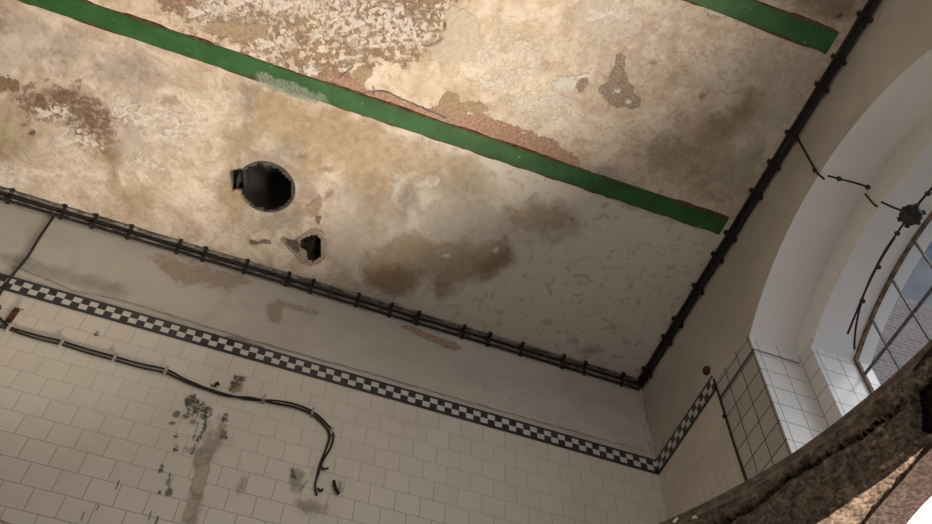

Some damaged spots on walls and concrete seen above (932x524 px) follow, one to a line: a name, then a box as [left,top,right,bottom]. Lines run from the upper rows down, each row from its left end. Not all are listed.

peeling [158,0,580,167]
peeling [553,73,590,94]
peeling [598,54,641,109]
damp [169,395,228,521]
spalling [658,339,932,524]